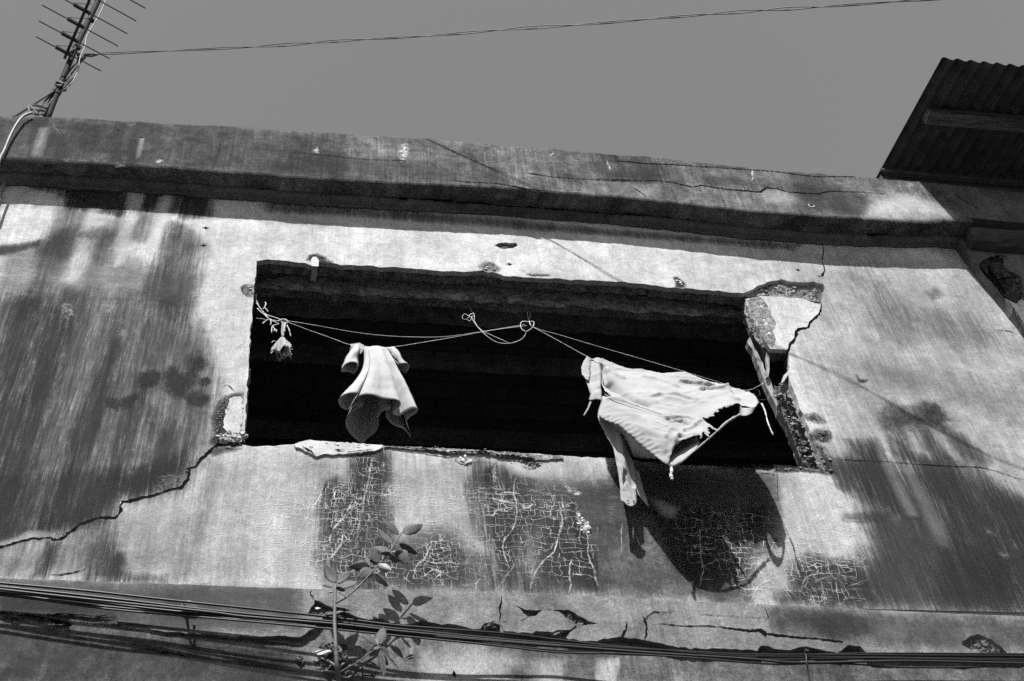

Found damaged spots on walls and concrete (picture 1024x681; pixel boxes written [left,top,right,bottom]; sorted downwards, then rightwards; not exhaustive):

crack [370,160,880,220]
flaking render [980,260,1022,303]
flaking render [744,283,823,348]
flaking render [211,393,248,444]
flaking render [718,383,834,479]
crack [0,442,246,553]
crack [240,444,598,621]
crack [621,507,868,642]
flaking render [530,612,589,639]
flaking render [962,636,1003,653]